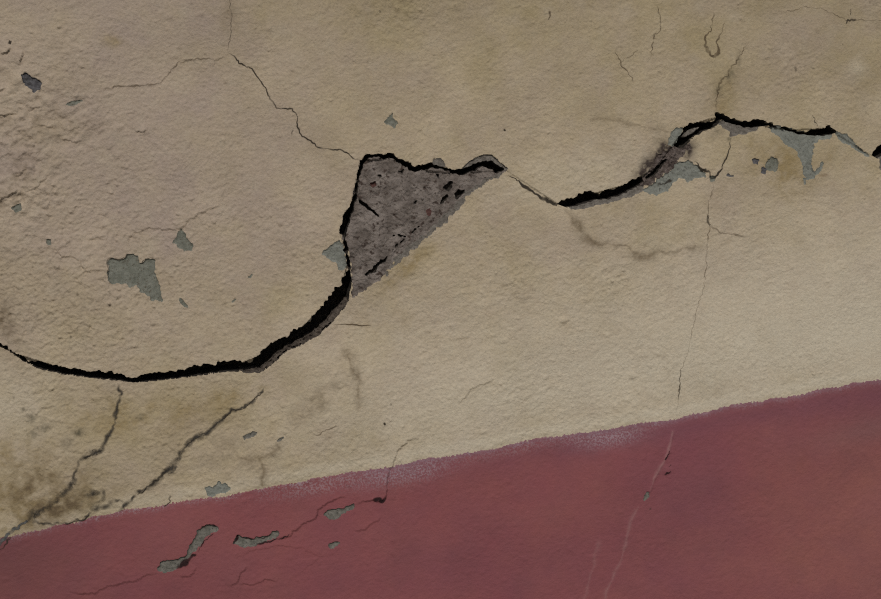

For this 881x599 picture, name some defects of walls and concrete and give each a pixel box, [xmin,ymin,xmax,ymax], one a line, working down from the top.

crack [704,28,720,57]
spalling [21,73,42,93]
peeling [719,120,881,185]
crack [872,145,881,159]
spalling [322,154,508,298]
peeling [106,254,163,302]
crack [0,51,836,546]
peeling [323,503,355,520]
peeling [157,524,219,573]
peeling [233,530,288,548]